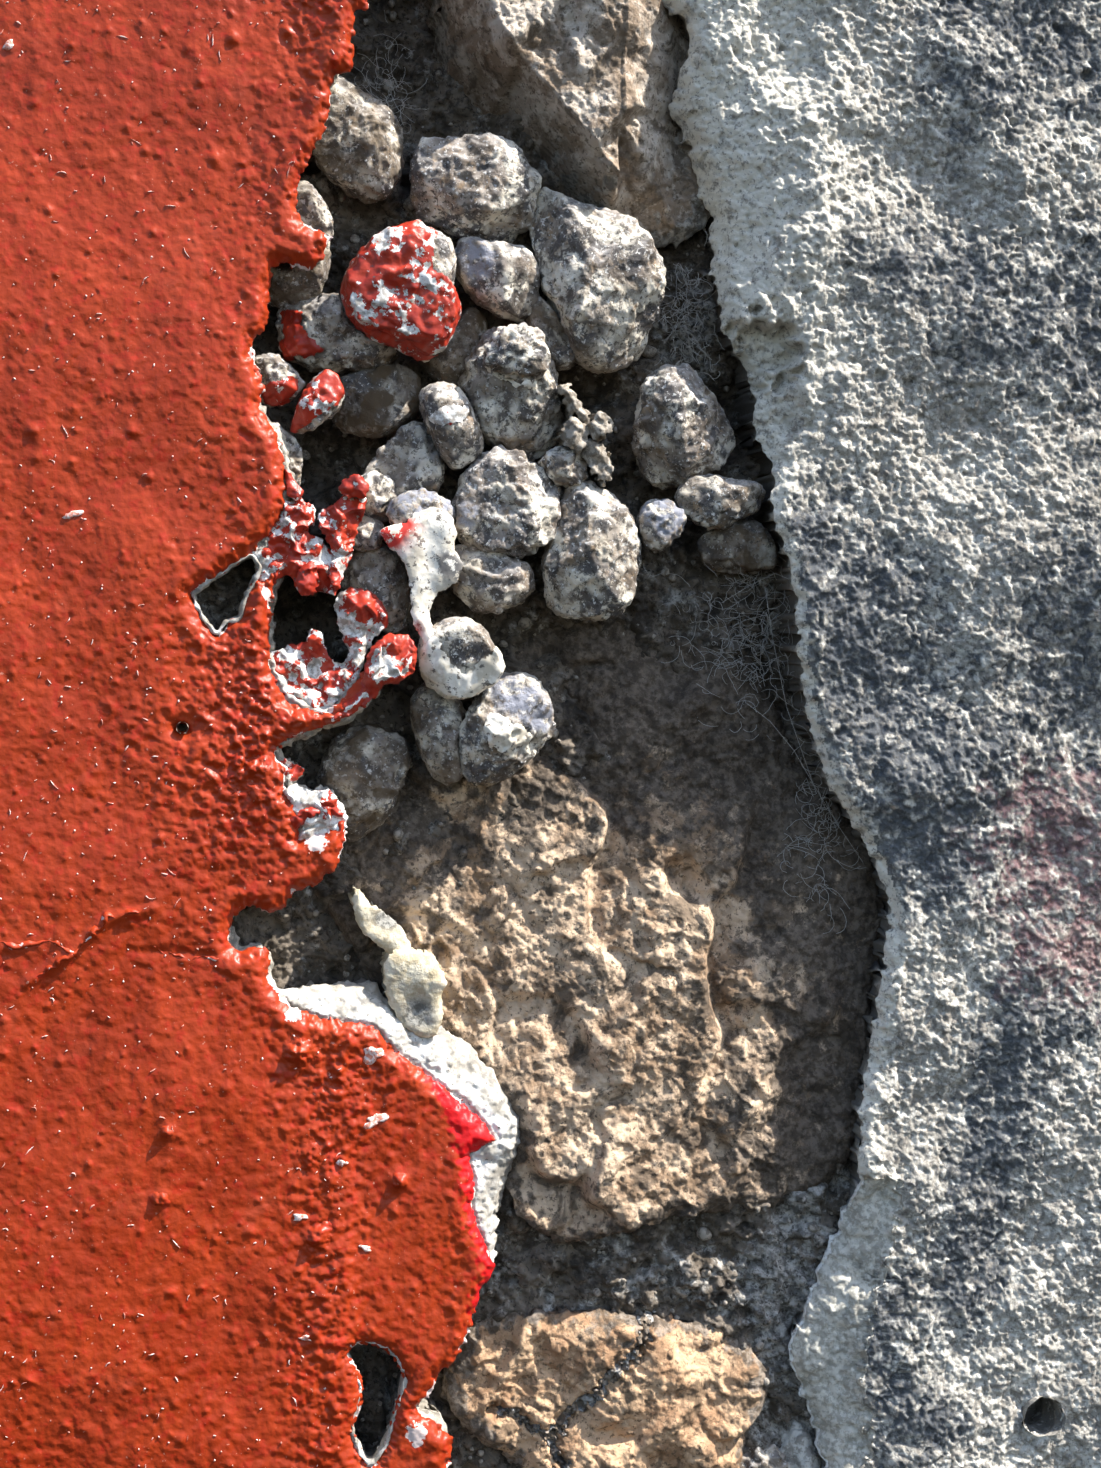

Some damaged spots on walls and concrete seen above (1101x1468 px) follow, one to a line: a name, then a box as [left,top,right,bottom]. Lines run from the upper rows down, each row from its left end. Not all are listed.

spalling [300,0,572,296]
spalling [196,217,818,997]
crack [0,907,149,977]
crack [154,946,224,962]
peeling [363,1047,384,1065]
peeling [364,1113,389,1129]
spalling [472,1159,852,1468]
spalling [349,1344,401,1445]
spalling [427,1368,522,1468]
crack [486,1304,657,1468]